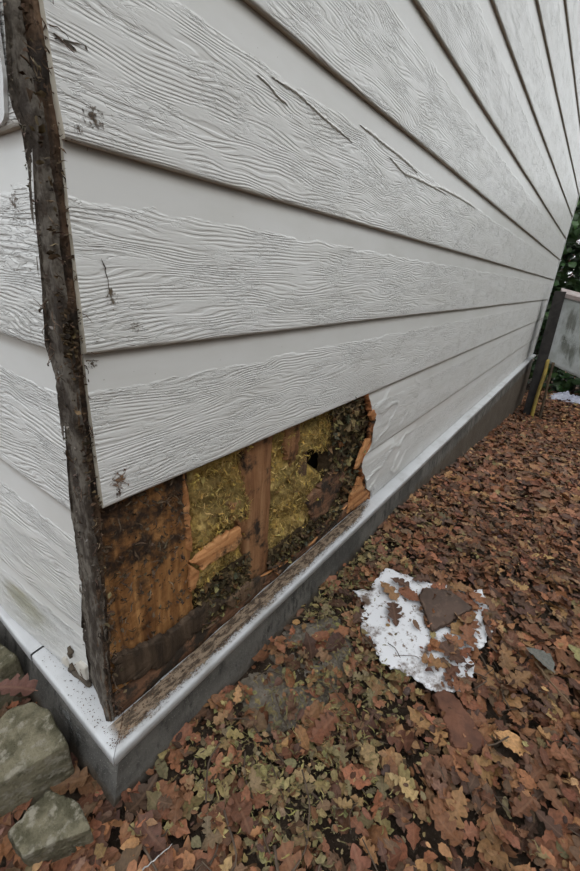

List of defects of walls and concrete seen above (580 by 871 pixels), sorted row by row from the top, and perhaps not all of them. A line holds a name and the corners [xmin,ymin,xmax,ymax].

crack [257,75,475,208]
spalling [0,0,288,721]
spalling [280,424,300,467]
spalling [305,394,377,546]